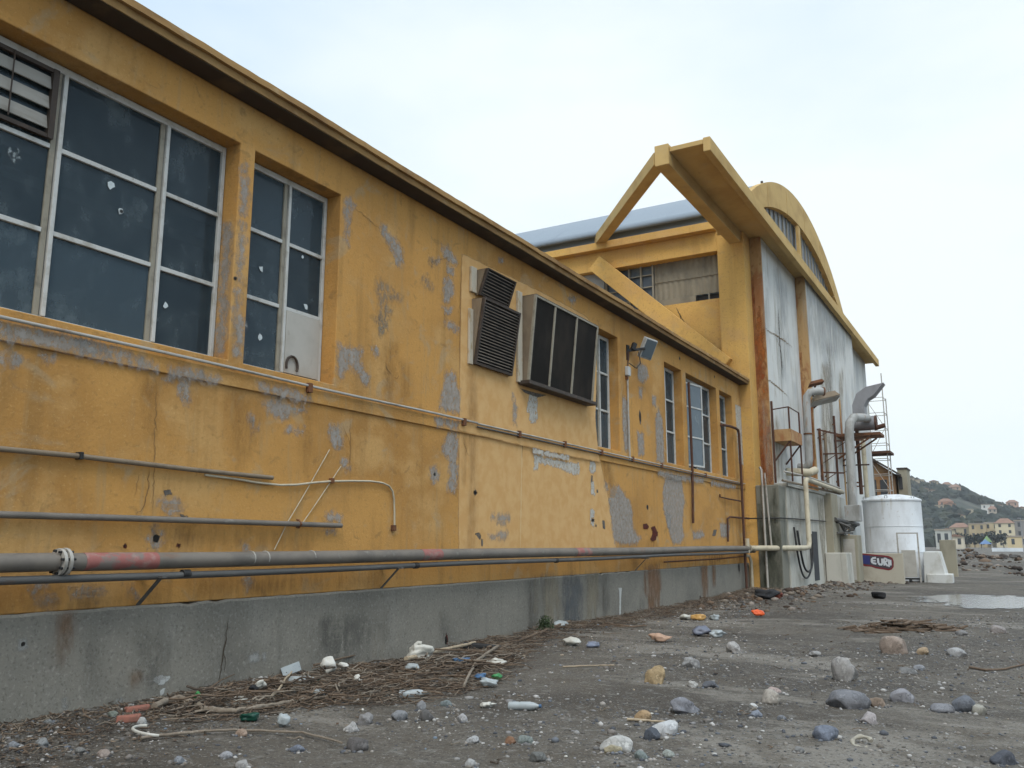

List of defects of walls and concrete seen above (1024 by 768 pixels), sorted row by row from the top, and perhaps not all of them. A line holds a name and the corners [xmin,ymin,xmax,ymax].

crack [135,383,158,512]
peeling [338,346,370,384]
peeling [431,372,461,492]
peeling [533,448,640,544]
peeling [622,363,735,543]
corrosion [751,285,772,484]
crack [219,624,228,678]